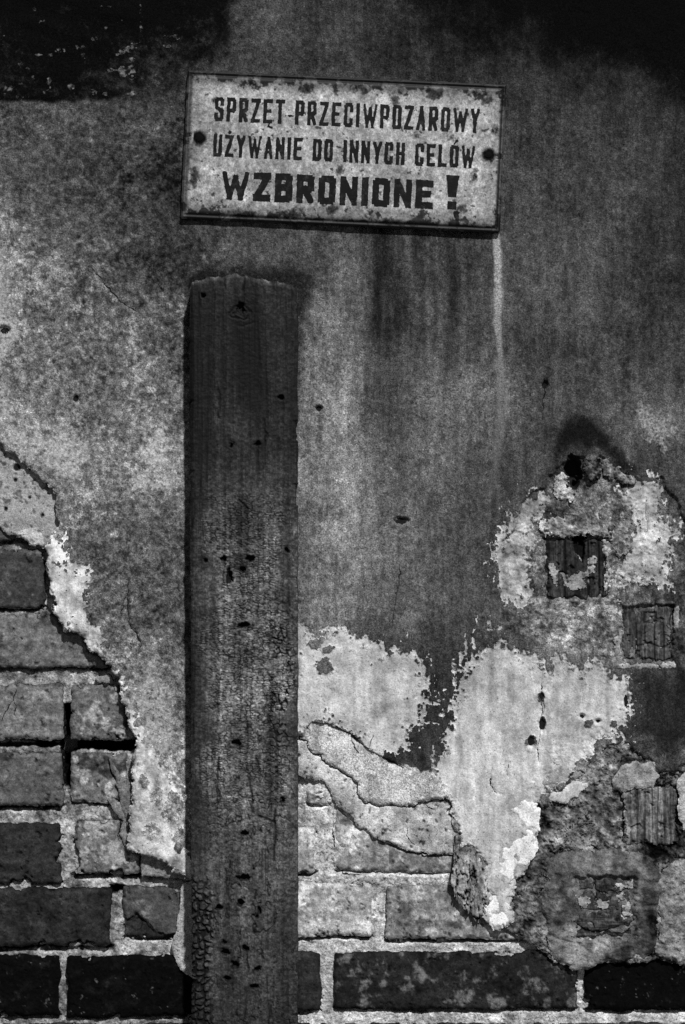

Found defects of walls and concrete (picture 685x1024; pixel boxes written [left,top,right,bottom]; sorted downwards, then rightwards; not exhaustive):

water stain [372,228,390,336]
water stain [493,234,503,371]
peeling [483,453,685,646]
spalling [0,443,192,881]
peeling [298,615,685,966]